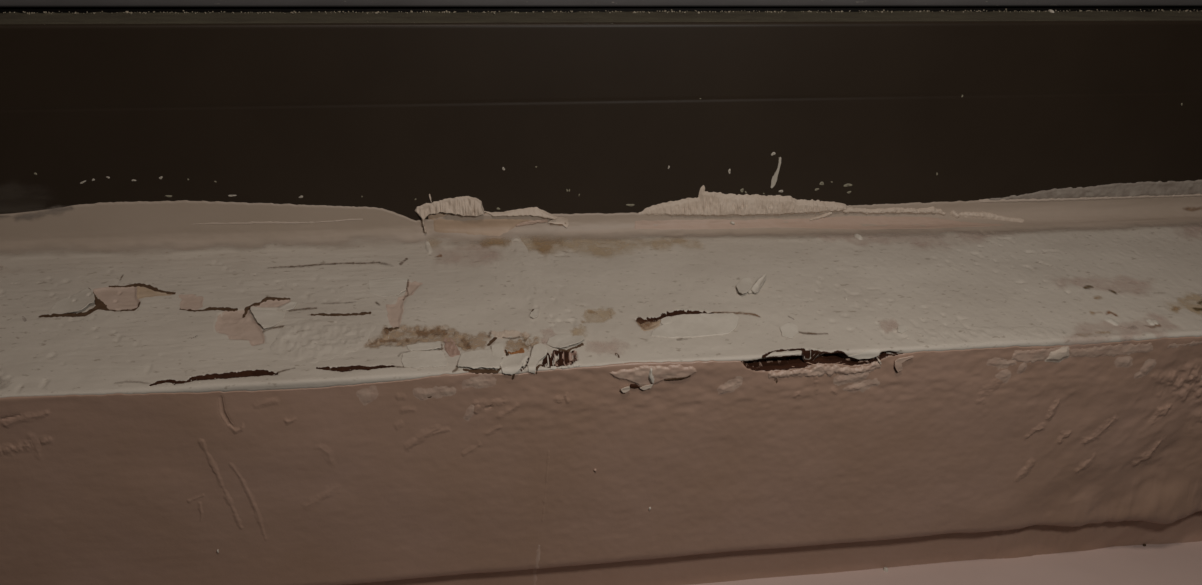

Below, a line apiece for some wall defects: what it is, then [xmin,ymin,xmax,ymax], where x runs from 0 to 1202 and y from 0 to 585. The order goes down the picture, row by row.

peeling [415,196,557,234]
peeling [639,185,847,217]
peeling [39,276,297,346]
crack [149,369,285,386]
crack [316,364,404,372]
spalling [394,330,585,401]
peeling [609,364,697,393]
peeling [717,323,914,399]
peeling [974,346,1070,406]